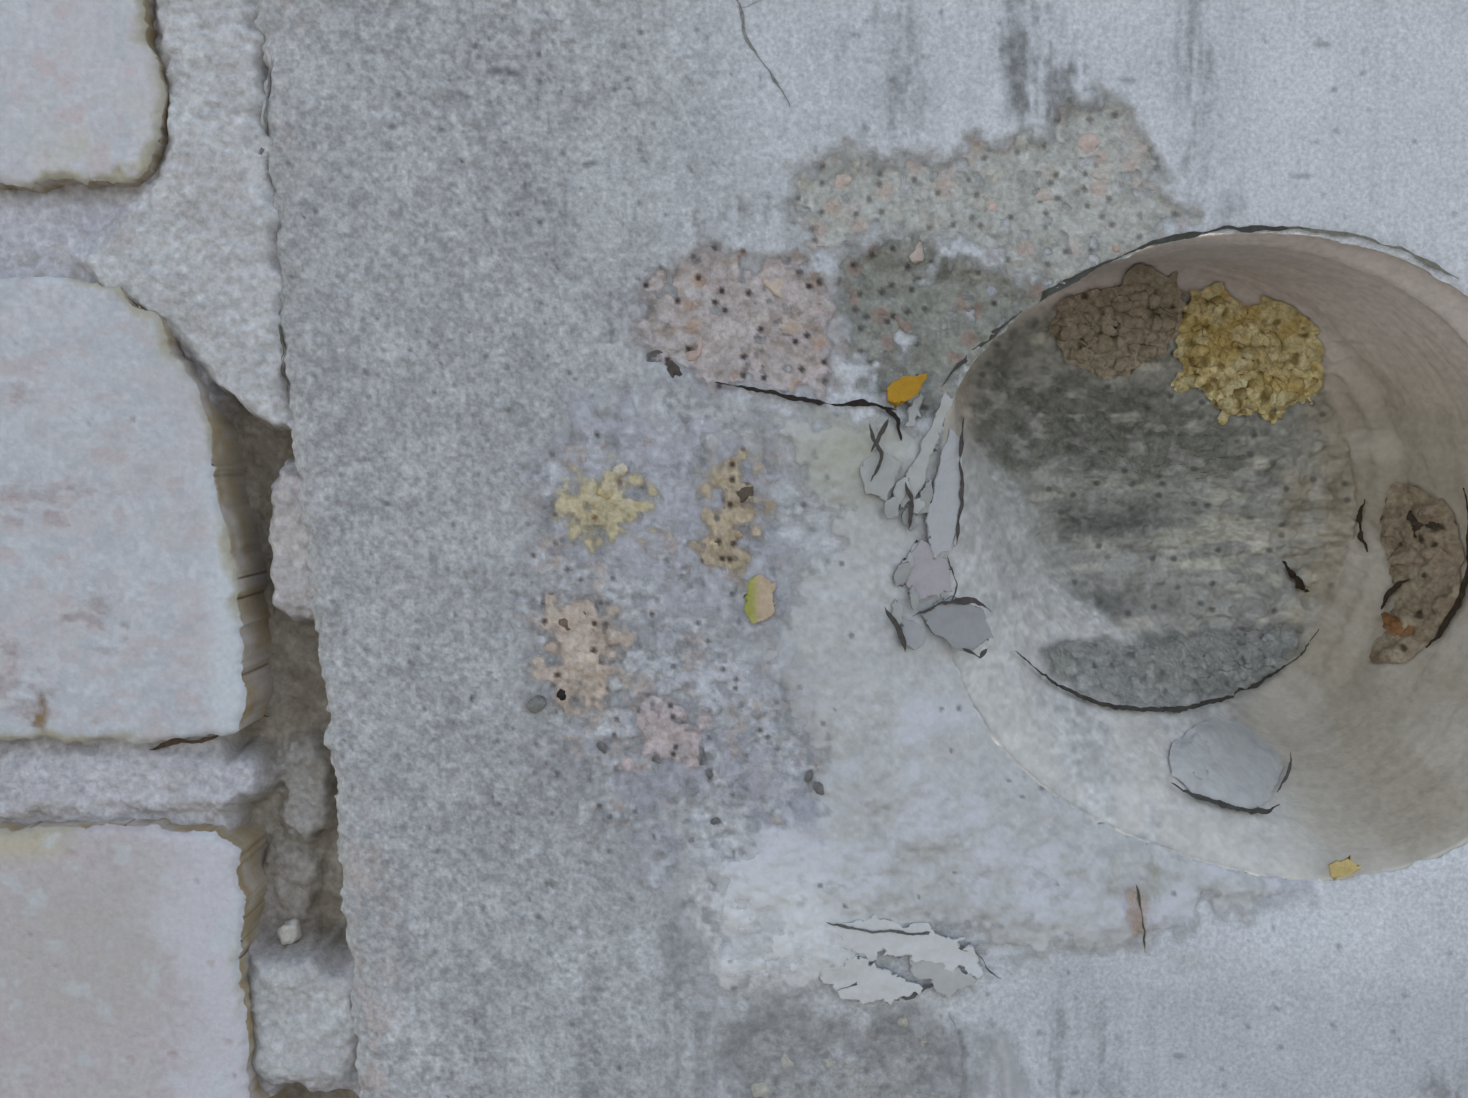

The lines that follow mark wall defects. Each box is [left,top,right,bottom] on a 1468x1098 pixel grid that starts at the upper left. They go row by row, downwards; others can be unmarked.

crack [736,0,790,106]
spalling [515,94,1204,915]